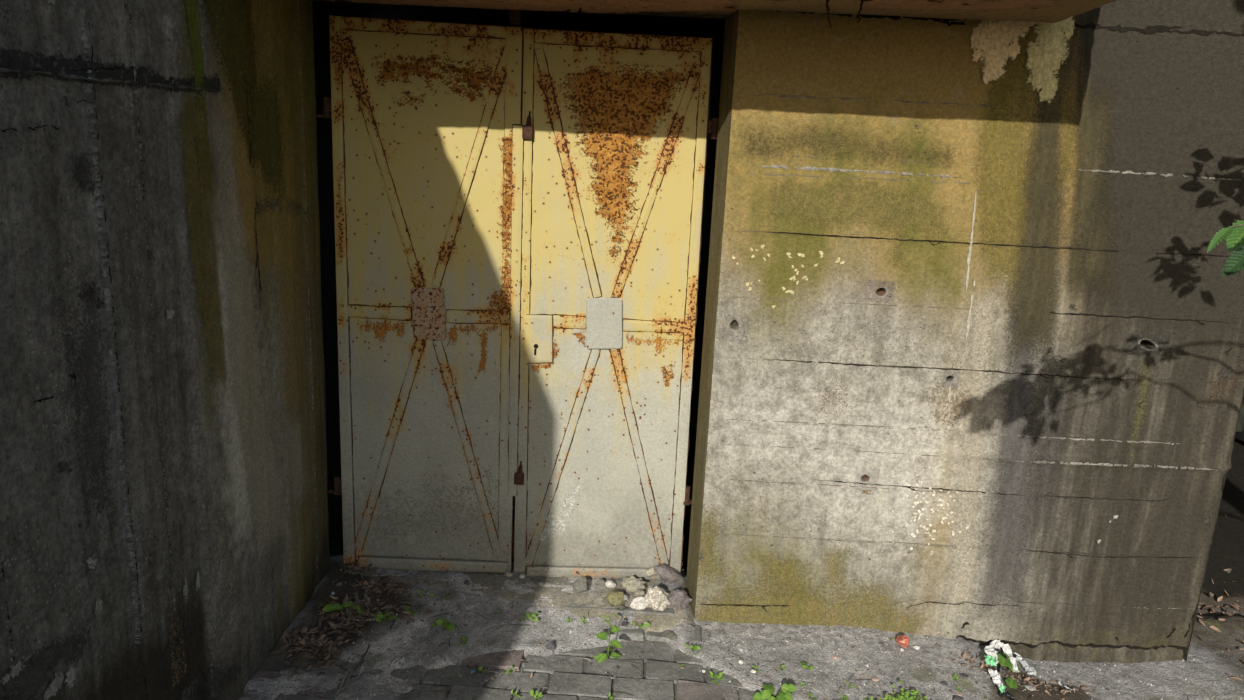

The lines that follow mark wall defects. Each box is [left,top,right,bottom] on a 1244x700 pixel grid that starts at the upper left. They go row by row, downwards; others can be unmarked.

water stain [328,0,741,14]
rust [372,46,497,113]
rust [559,61,691,263]
rust [447,130,513,373]
water stain [52,252,136,549]
water stain [196,84,305,562]
rust [357,320,405,342]
rust [531,339,559,372]
rust [625,333,680,387]
water stain [854,0,1113,610]
water stain [540,482,585,542]
water stain [0,619,92,700]